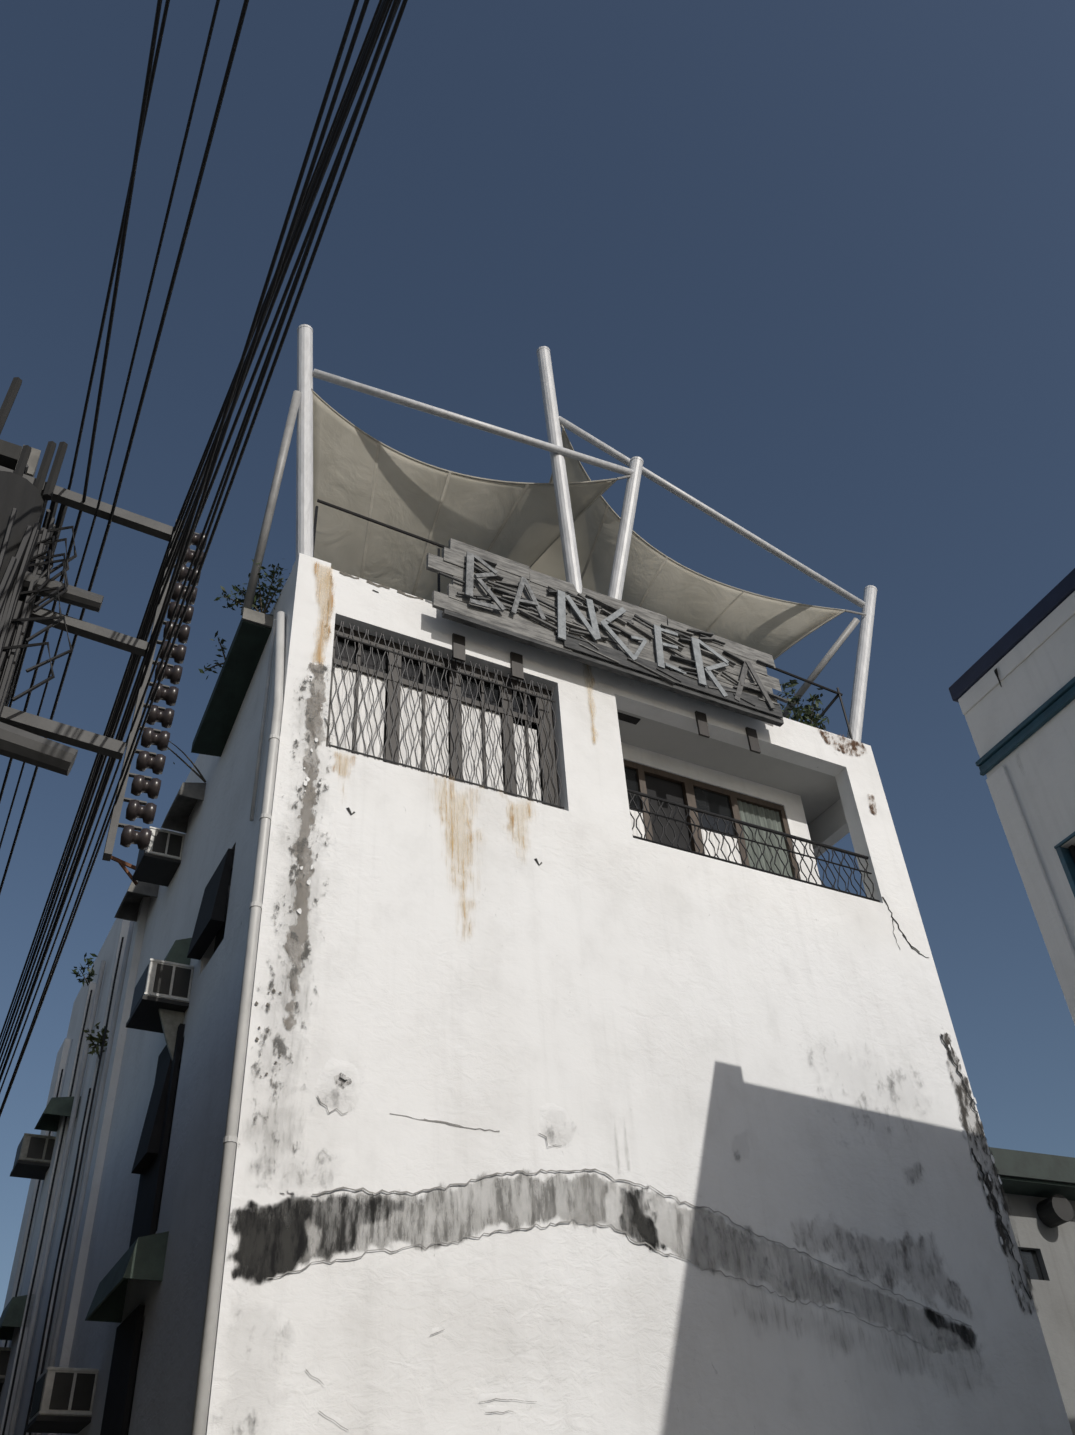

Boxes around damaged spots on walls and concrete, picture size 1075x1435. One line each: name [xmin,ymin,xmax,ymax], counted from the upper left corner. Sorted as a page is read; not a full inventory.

corrosion [441,791,472,918]
crack [882,897,929,958]
crack [390,1113,500,1132]
leakage [232,1168,975,1354]